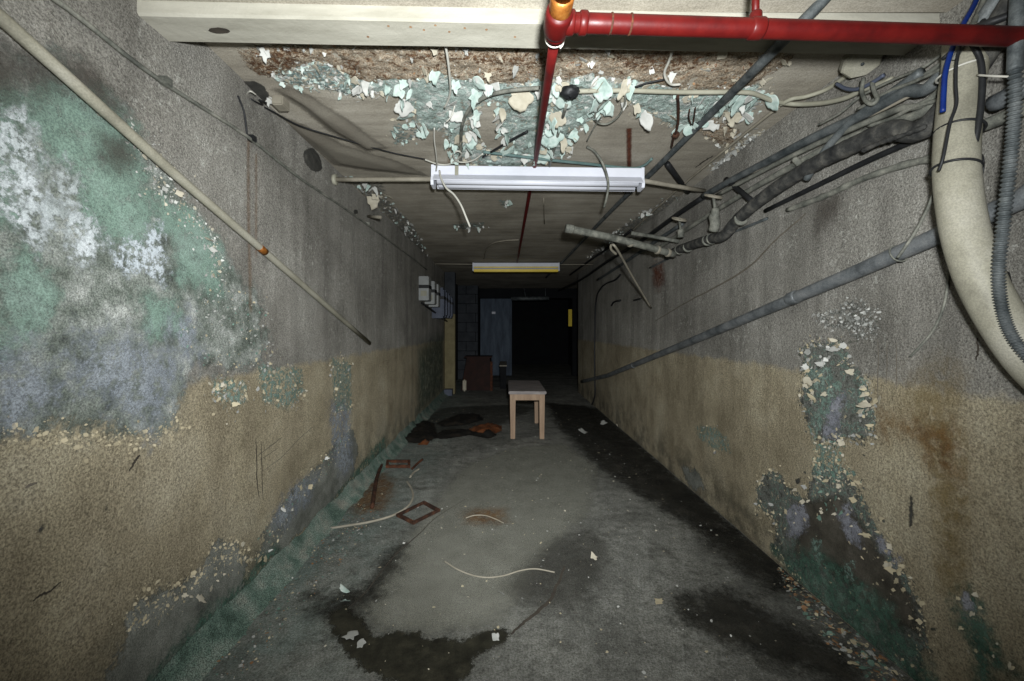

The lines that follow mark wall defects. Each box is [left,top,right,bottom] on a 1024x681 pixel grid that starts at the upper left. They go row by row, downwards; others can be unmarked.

damp [0,106,167,286]
peeling [0,43,308,473]
spalling [237,43,794,171]
damp [0,351,64,426]
damp [75,317,203,430]
peeling [103,427,386,681]
damp [308,545,510,681]
damp [548,403,800,592]
damp [673,588,862,681]
peeling [751,297,1018,681]